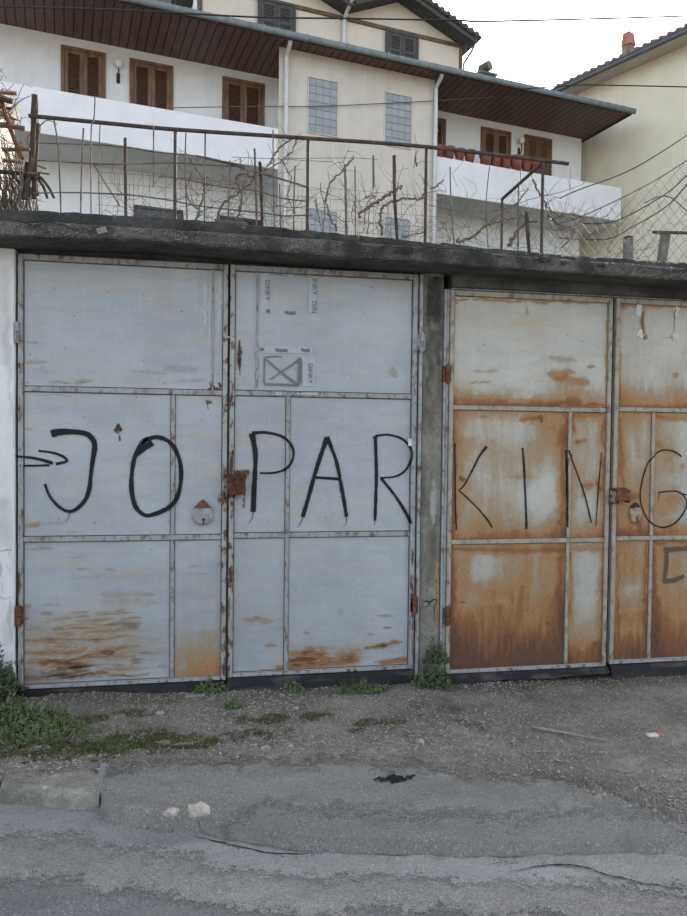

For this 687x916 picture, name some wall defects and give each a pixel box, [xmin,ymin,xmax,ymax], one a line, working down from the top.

corrosion [455,297,608,310]
corrosion [620,304,687,340]
corrosion [223,450,250,478]
corrosion [449,315,608,669]
corrosion [613,351,687,660]
corrosion [260,576,415,671]
corrosion [17,604,164,682]
crack [191,834,323,854]
crack [513,864,685,890]